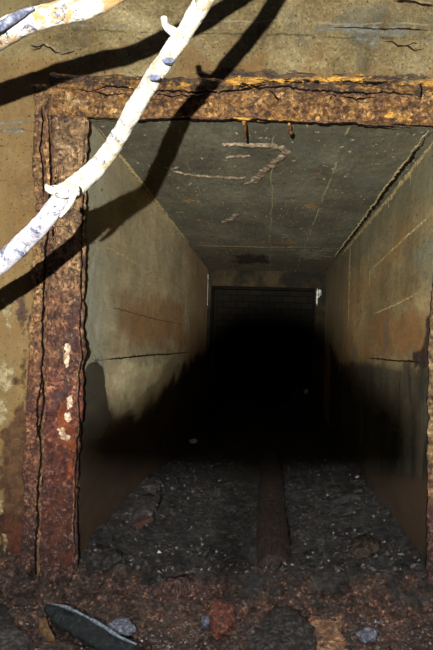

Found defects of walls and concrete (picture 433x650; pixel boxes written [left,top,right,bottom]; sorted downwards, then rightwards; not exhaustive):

crack [30,42,75,55]
crack [334,27,432,51]
crack [152,78,432,101]
corrosion [176,67,433,89]
crack [118,115,433,324]
corrosion [63,298,81,354]
crack [100,352,188,361]
crack [370,356,414,364]
crack [71,194,85,576]
crack [34,221,57,576]
corrosion [50,363,77,481]